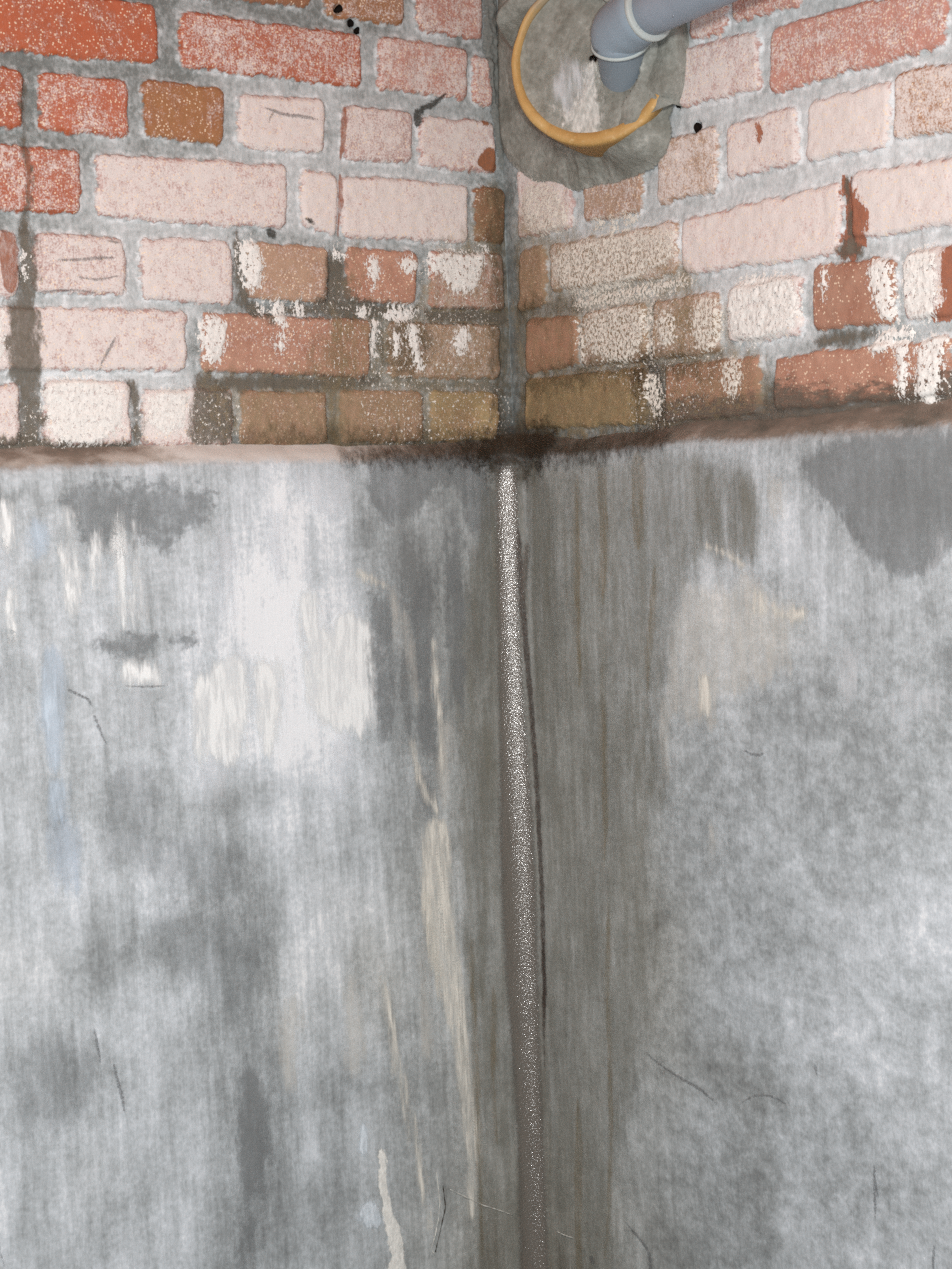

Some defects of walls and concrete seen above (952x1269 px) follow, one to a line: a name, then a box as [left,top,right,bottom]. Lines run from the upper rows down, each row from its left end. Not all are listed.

damp [0,83,952,530]
damp [0,498,15,563]
damp [3,587,17,643]
damp [42,646,65,820]
damp [33,477,206,689]
damp [191,654,285,783]
damp [299,571,392,763]
damp [699,674,710,716]
damp [814,430,952,575]
damp [384,987,401,1065]
damp [414,755,478,1218]
peeling [358,1124,406,1269]